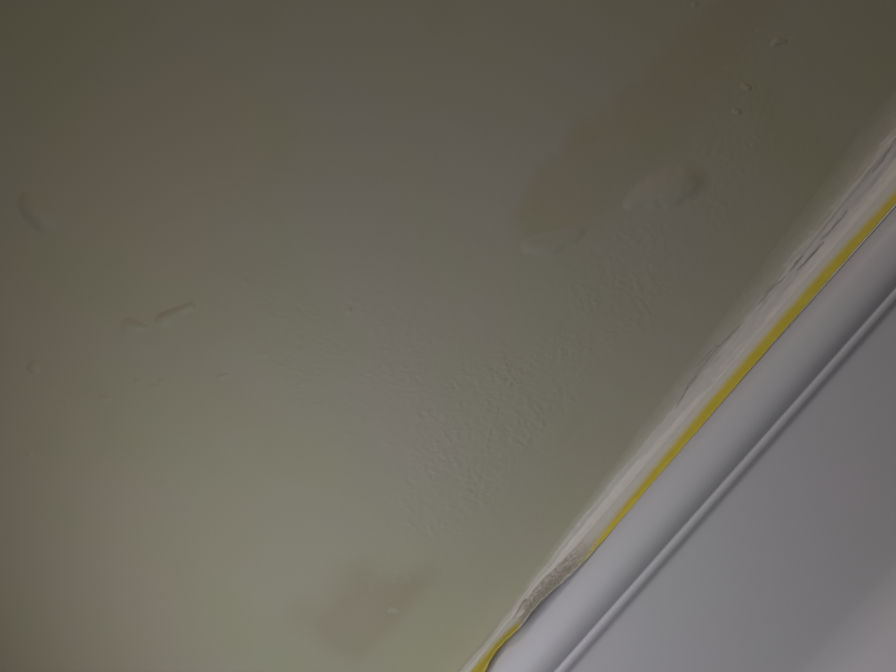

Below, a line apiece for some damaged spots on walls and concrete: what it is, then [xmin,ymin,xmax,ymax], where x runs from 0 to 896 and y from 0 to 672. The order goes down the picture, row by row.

crack [758,211,847,305]